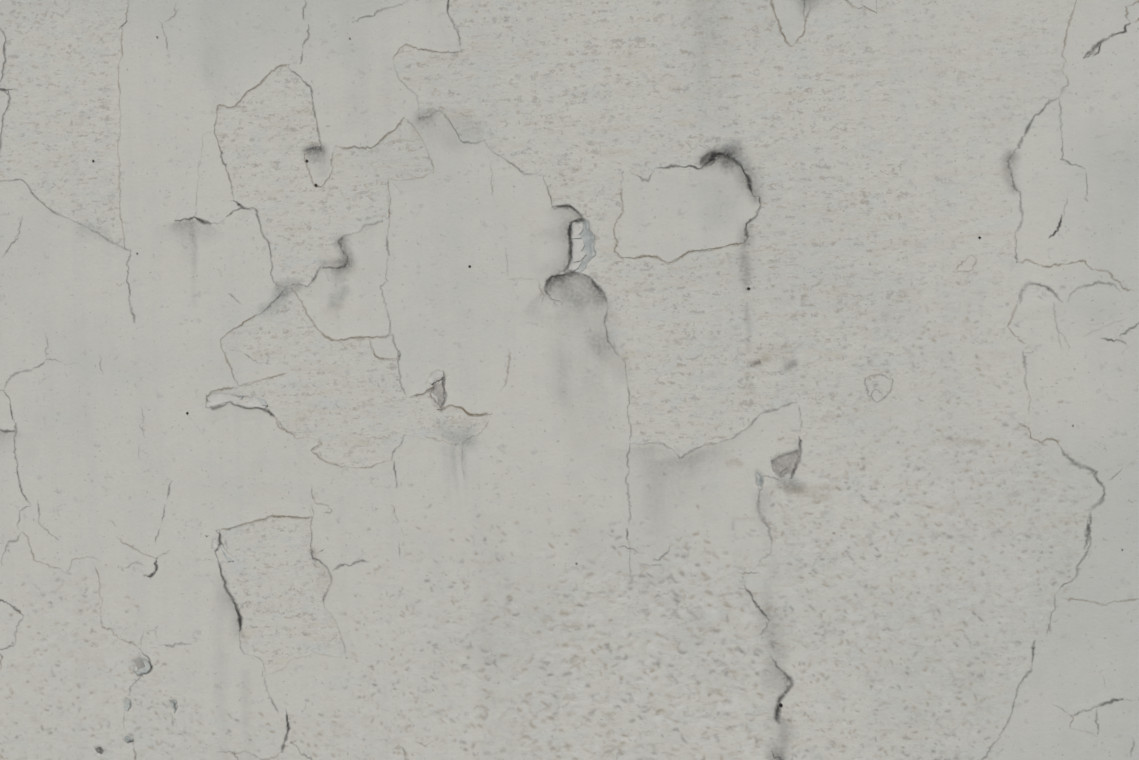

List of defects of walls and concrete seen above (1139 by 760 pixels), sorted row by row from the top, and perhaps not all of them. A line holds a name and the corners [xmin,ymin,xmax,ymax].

peeling [0,0,141,263]
crack [172,208,240,224]
peeling [202,0,901,472]
crack [1013,274,1102,299]
crack [0,405,15,432]
spalling [755,449,799,487]
crack [141,555,158,577]